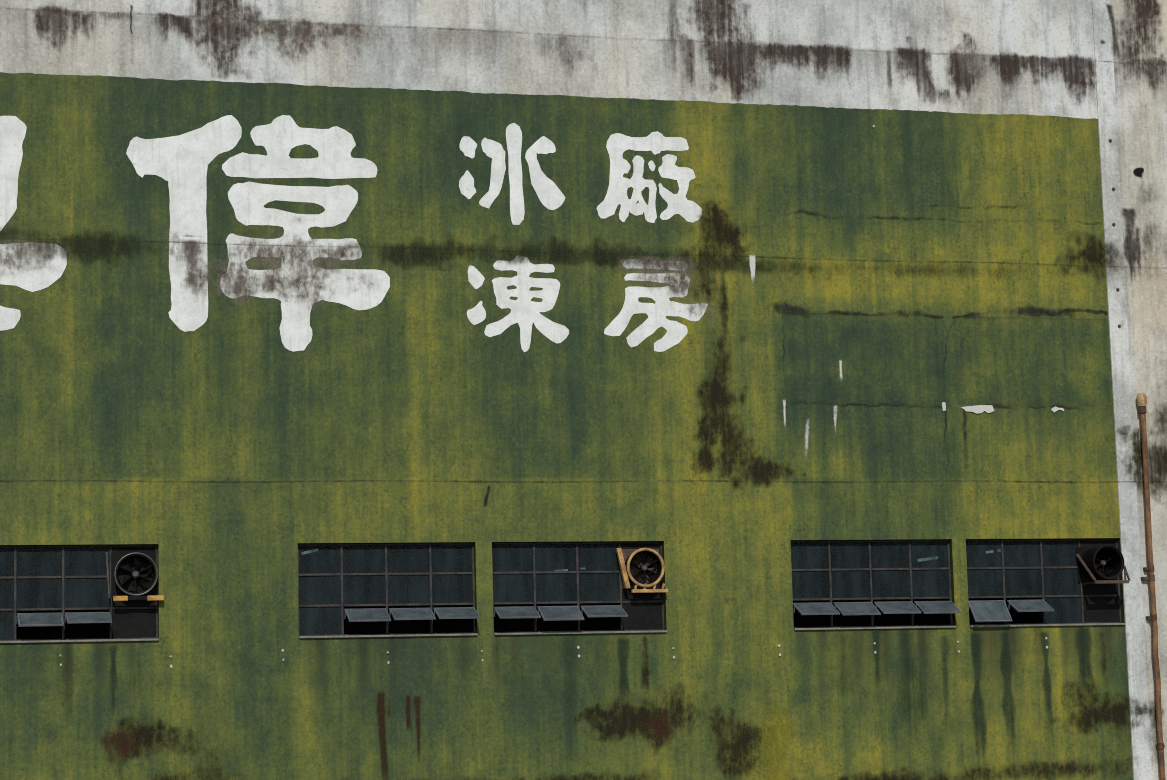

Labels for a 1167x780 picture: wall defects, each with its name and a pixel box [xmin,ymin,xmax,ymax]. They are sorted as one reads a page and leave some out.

leakage [256,19,368,57]
leakage [382,203,773,328]
leakage [694,342,792,487]
mould [1120,408,1167,494]
rust [377,692,390,777]
rust [406,696,421,750]